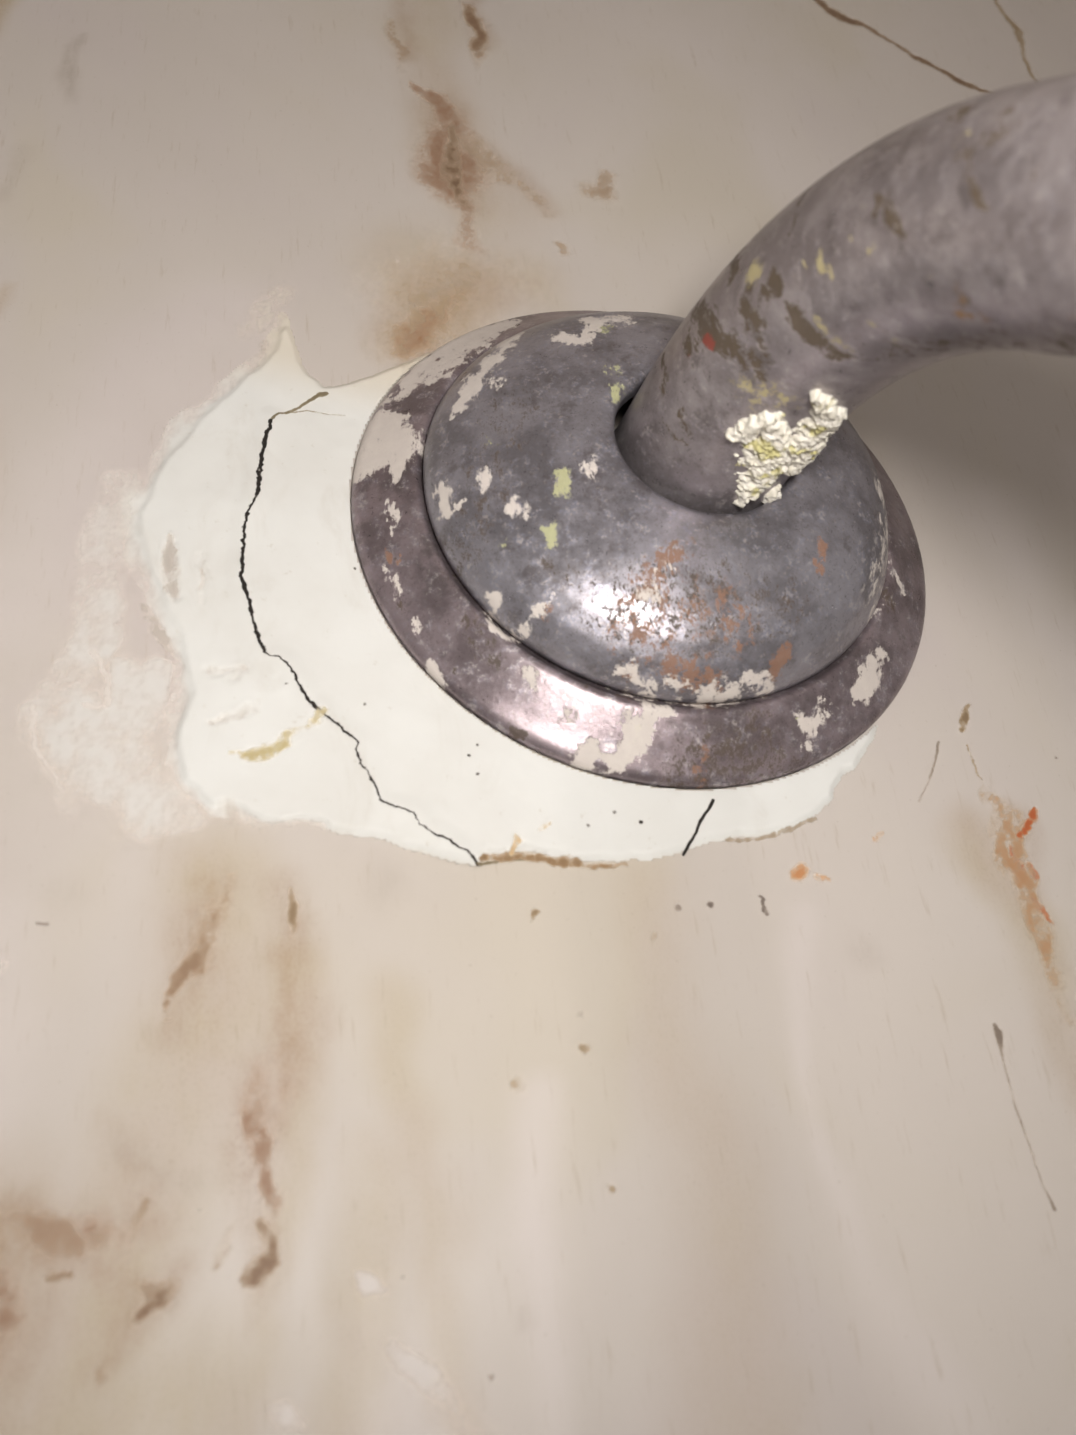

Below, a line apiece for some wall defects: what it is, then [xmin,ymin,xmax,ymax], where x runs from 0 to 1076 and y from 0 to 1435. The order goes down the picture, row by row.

leakage [463,4,488,58]
leakage [814,0,988,93]
crack [995,0,1036,80]
leakage [410,84,540,248]
crack [238,392,524,866]
peeling [120,292,878,866]
rust [959,705,982,779]
rust [989,795,1058,985]